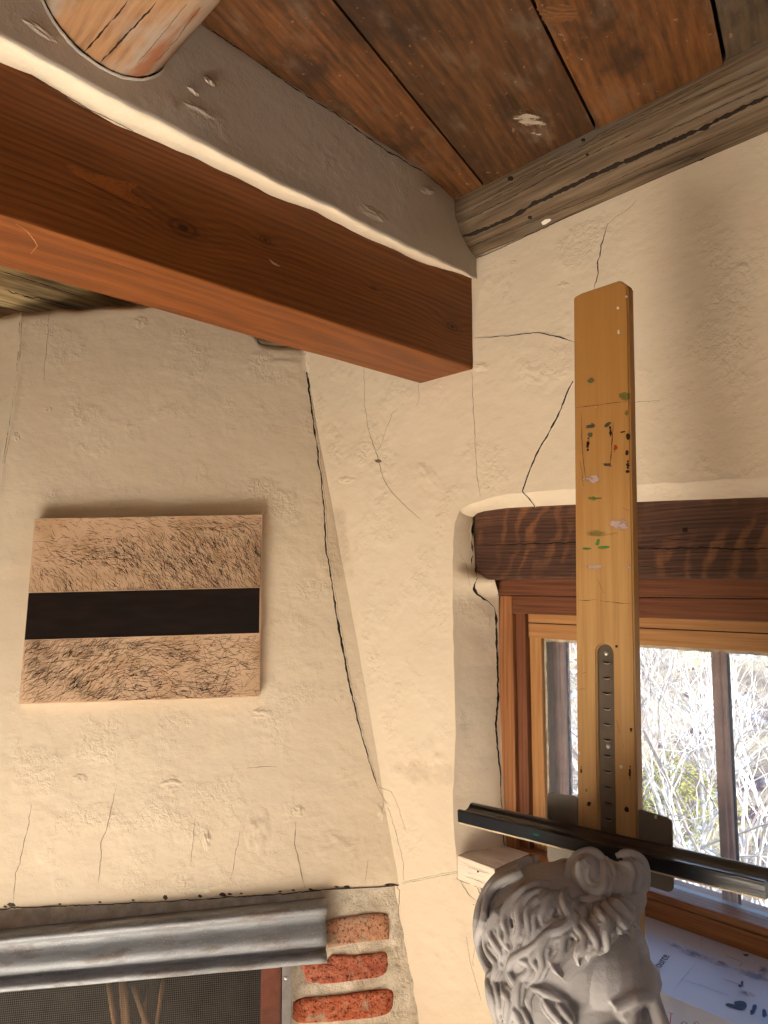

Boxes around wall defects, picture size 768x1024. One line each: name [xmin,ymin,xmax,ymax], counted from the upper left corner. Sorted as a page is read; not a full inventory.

crack [475,203,634,289]
crack [485,332,573,342]
crack [522,381,574,507]
crack [638,537,768,571]
crack [304,351,489,922]
crack [460,522,576,809]